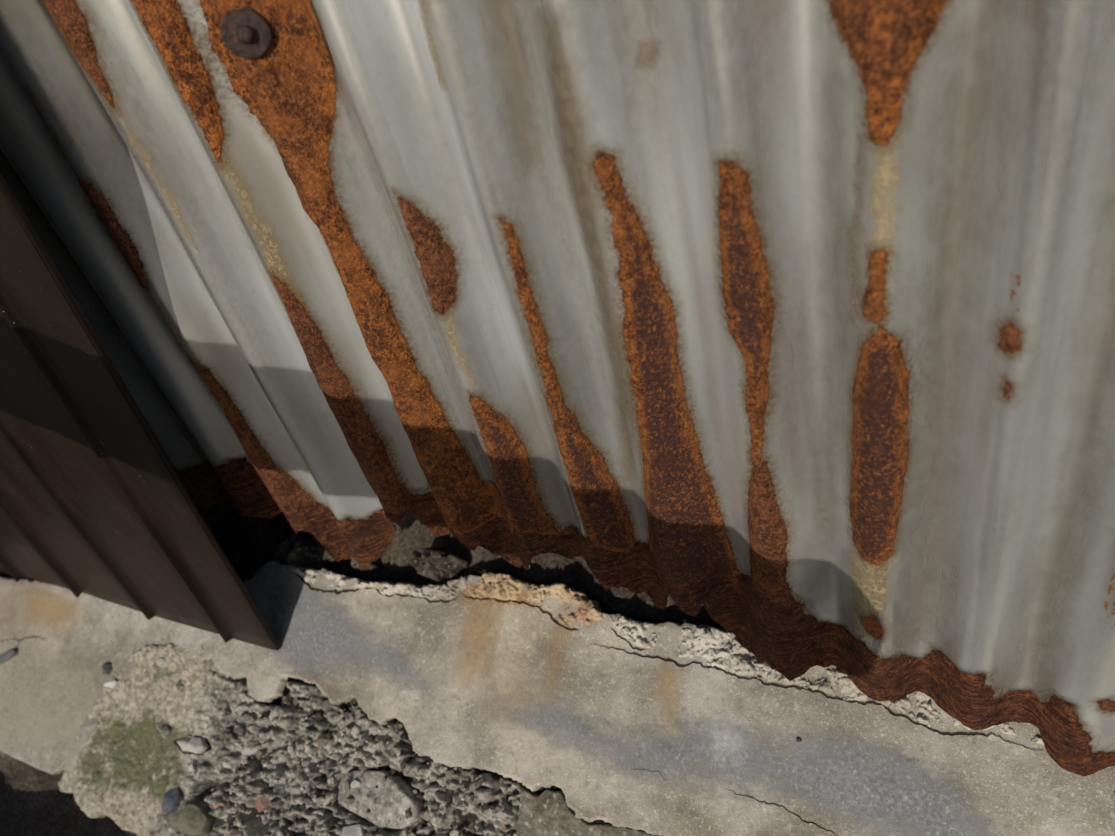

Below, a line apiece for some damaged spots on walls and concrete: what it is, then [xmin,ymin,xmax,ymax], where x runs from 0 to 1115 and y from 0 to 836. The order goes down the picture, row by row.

rust [42,0,115,109]
rust [131,0,238,184]
rust [78,179,150,290]
rust [197,0,515,535]
rust [550,42,631,474]
rust [826,0,951,640]
rust [149,149,1115,776]
spalling [58,643,658,836]
crack [289,570,1044,751]